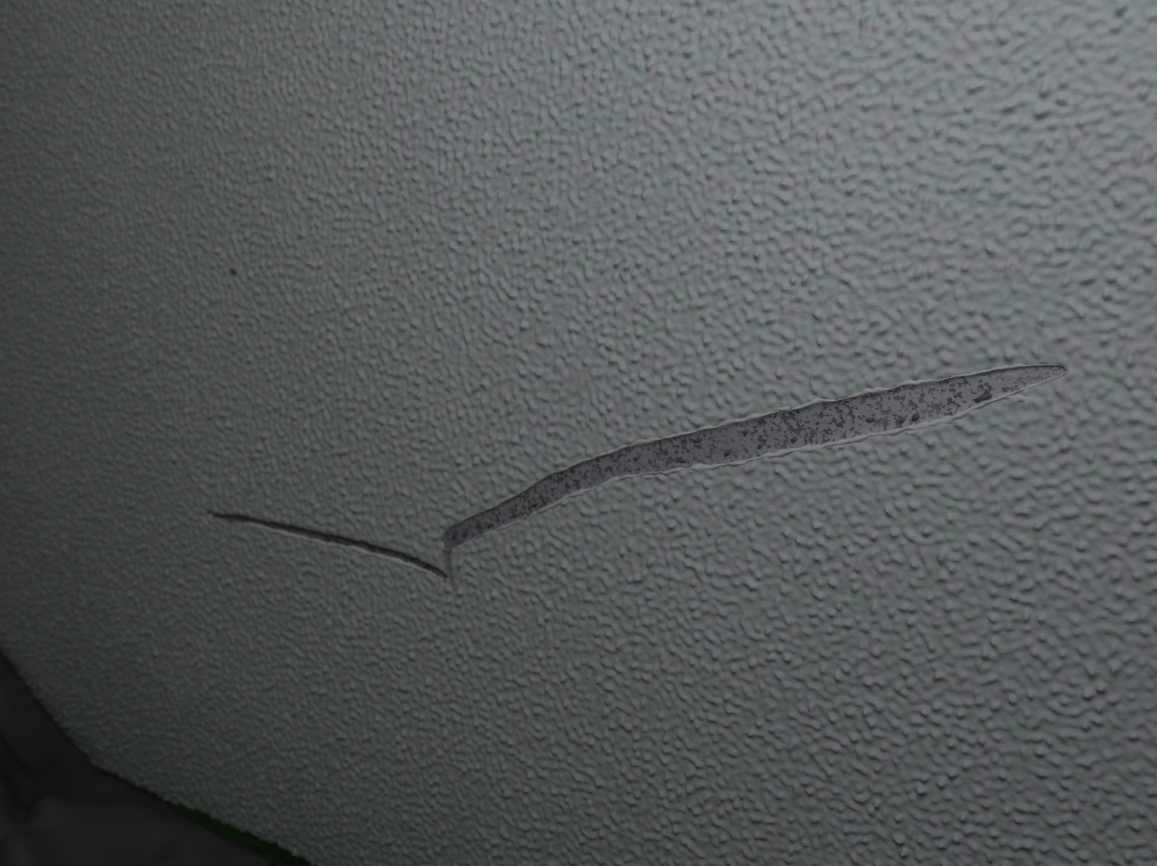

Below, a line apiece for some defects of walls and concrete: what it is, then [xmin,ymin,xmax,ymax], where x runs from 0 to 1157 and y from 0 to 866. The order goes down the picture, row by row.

crack [206,511,456,591]